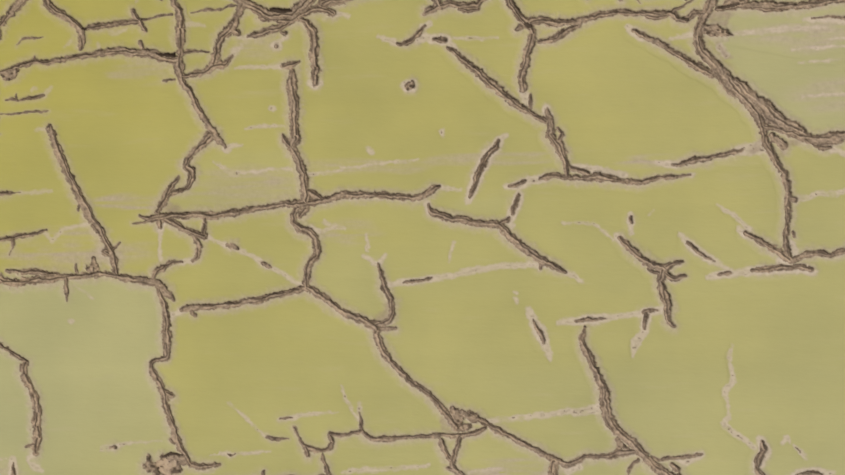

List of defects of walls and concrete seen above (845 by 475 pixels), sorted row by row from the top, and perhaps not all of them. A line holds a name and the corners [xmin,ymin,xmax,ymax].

crack [0,0,845,288]
crack [0,218,724,475]
crack [718,341,838,475]